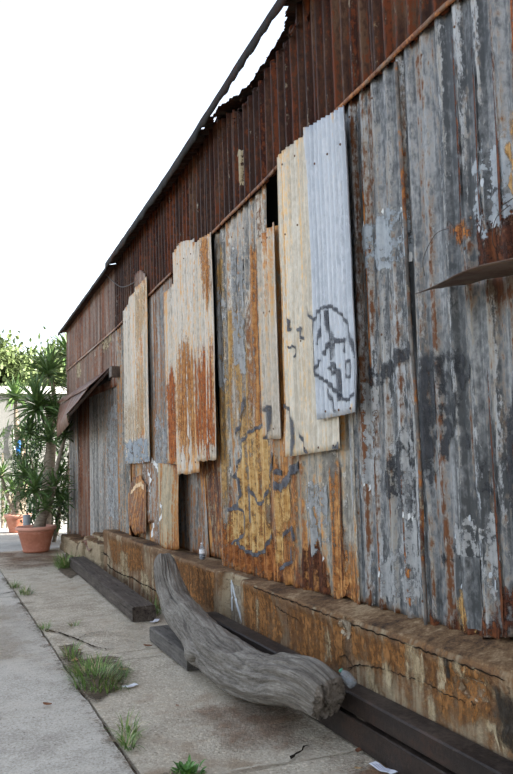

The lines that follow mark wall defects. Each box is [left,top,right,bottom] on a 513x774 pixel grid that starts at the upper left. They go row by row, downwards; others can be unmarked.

corrosion [450,37,513,269]
peeling [471,126,513,239]
corrosion [166,237,263,505]
crack [46,629,164,661]
crack [103,552,157,597]
corrosion [221,457,356,601]
corrosion [242,585,408,682]
crack [254,587,505,713]
peeling [378,428,421,603]
corrosion [429,374,513,639]
peeling [454,512,499,601]
crack [217,744,355,774]